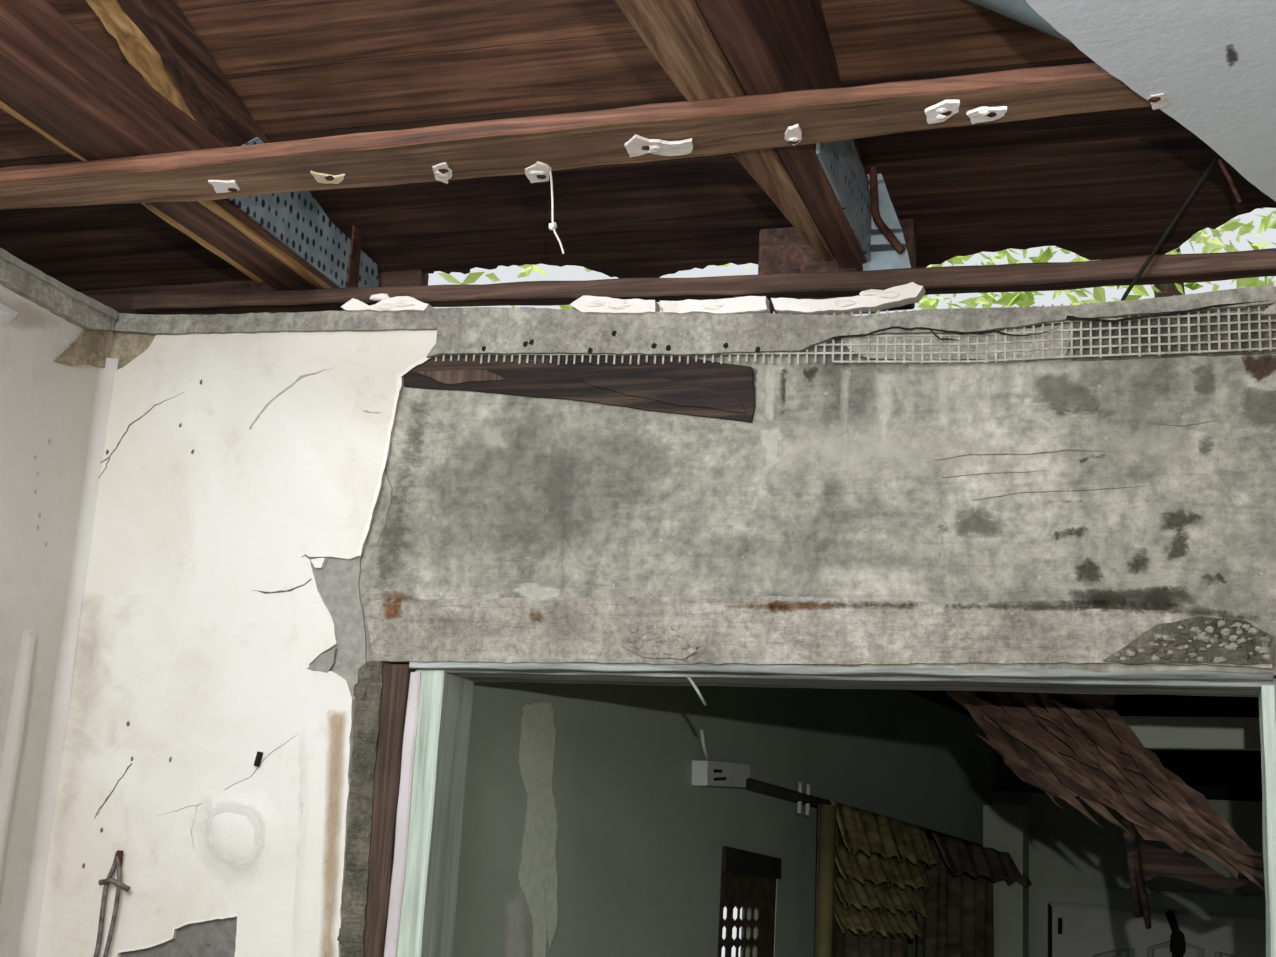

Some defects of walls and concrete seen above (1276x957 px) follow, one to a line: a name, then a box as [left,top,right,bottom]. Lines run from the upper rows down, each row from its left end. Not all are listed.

spalling [54,329,155,370]
corrosion [1243,355,1276,380]
crack [249,367,335,430]
crack [98,392,185,479]
spalling [252,357,430,701]
mould [1163,510,1200,558]
mould [1127,554,1148,573]
corrosion [742,601,837,613]
mould [953,559,1257,619]
spalling [1103,616,1273,665]
crack [94,763,132,819]
spalling [118,914,237,957]